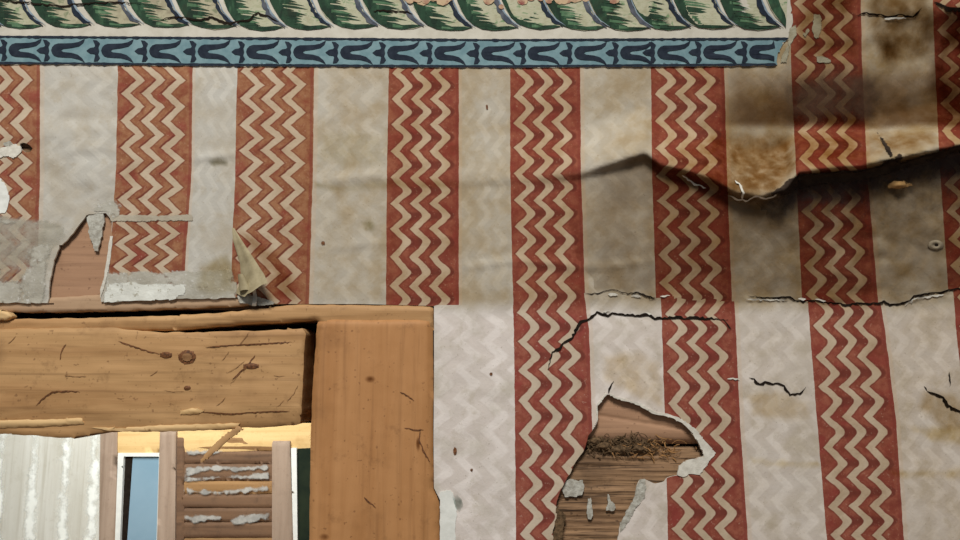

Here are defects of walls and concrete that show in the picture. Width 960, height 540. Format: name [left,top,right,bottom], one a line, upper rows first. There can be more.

leakage [941,14,960,49]
leakage [737,65,960,124]
peeling [0,141,22,158]
leakage [751,152,960,210]
peeling [0,178,62,304]
peeling [87,200,120,251]
peeling [104,269,237,303]
crack [748,288,960,307]
crack [548,289,731,369]
crack [728,378,806,396]
crack [924,373,960,412]
peeling [562,479,593,520]